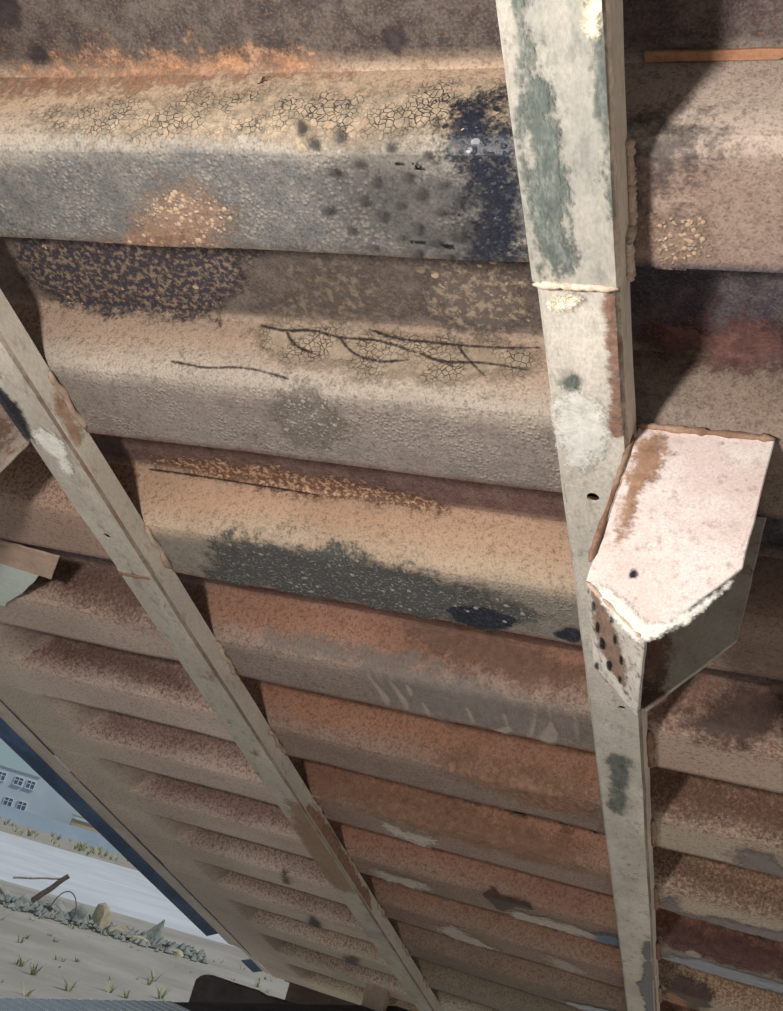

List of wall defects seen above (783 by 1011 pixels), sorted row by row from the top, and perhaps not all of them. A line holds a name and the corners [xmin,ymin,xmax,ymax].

corrosion [0,42,354,100]
peeling [13,77,535,342]
crack [171,316,540,387]
corrosion [600,293,622,438]
corrosion [635,305,783,376]
peeling [149,454,450,517]
corrosion [613,433,668,540]
water stain [668,677,783,750]